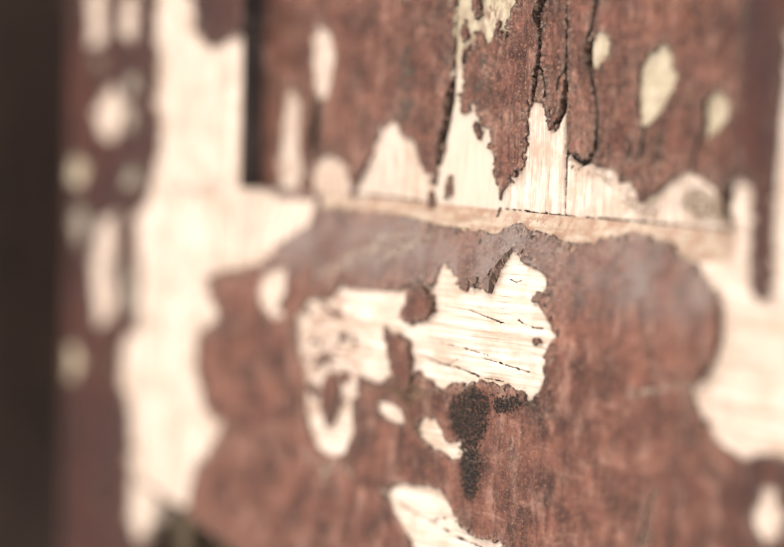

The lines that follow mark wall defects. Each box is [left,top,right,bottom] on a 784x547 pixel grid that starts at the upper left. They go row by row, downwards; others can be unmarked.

crack [530,0,549,20]
crack [578,31,602,72]
crack [506,53,733,231]
peeling [120,0,335,540]
peeling [294,0,784,460]
damp [444,385,527,505]
peeling [380,478,502,547]
peeling [745,485,784,544]